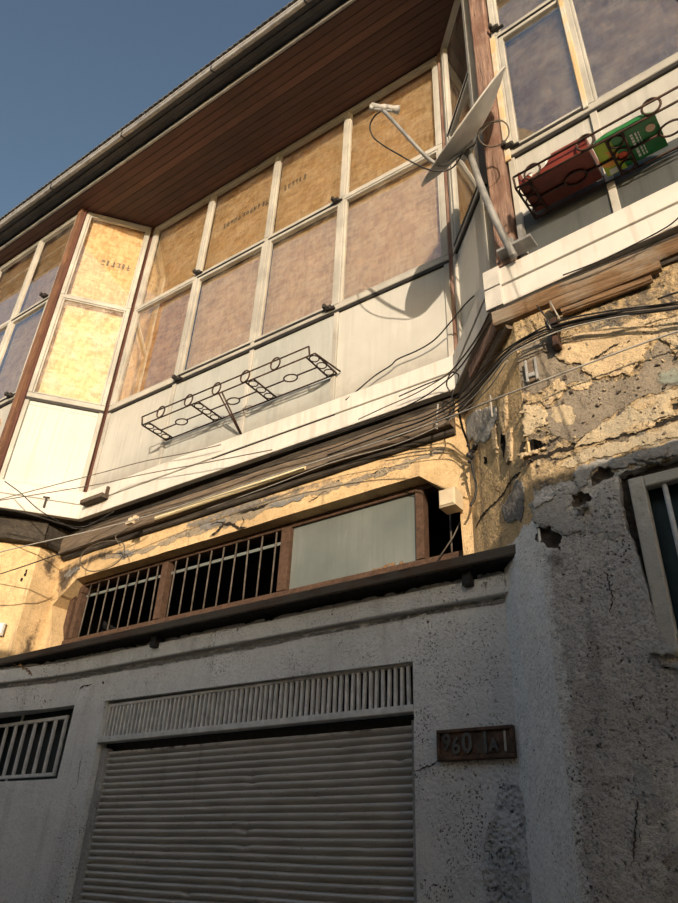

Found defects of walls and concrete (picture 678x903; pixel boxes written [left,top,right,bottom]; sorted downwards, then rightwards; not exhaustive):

flaking render [100,447,446,560]
flaking render [466,315,678,586]
crack [631,799,642,864]